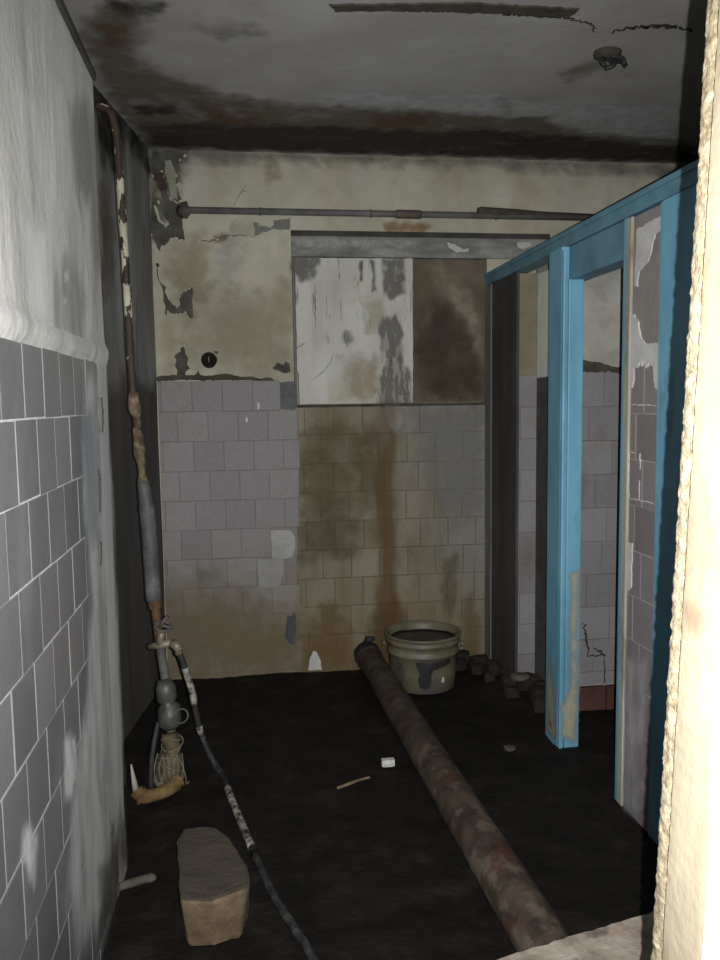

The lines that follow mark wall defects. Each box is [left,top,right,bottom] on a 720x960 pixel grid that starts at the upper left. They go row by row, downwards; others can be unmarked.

flaking render [329,2,580,18]
crack [408,11,693,34]
water stain [85,1,696,223]
peeling [150,151,187,251]
peeling [634,216,661,287]
peeling [160,283,193,319]
water stain [416,260,483,392]
crack [583,624,606,683]